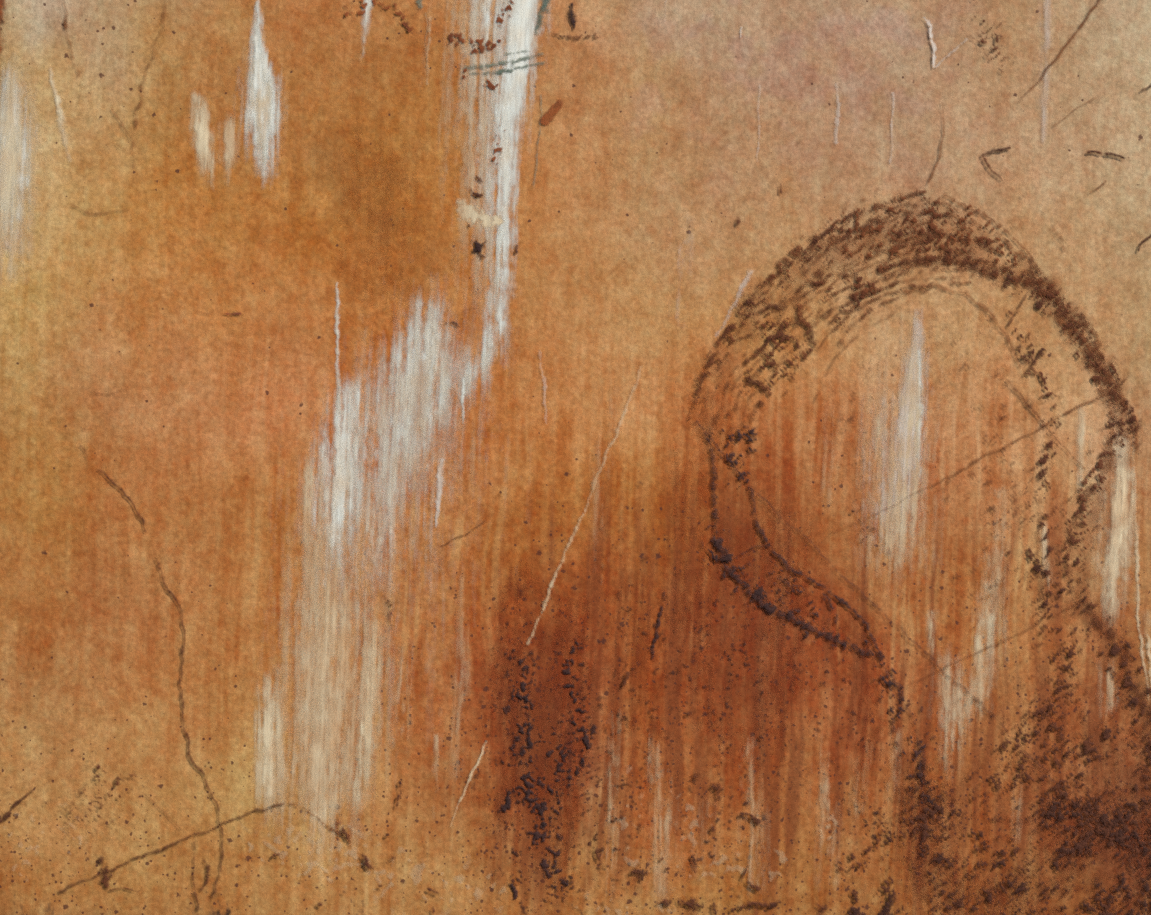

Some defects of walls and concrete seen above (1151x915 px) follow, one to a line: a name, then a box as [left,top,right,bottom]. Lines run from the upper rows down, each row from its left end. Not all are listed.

peeling [194,1,280,175]
rust [344,0,413,32]
rust [449,32,501,54]
rust [974,16,1008,72]
crack [101,471,146,532]
peeling [257,0,537,835]
rust [689,190,1151,915]
crack [158,563,224,911]
rust [500,638,597,909]